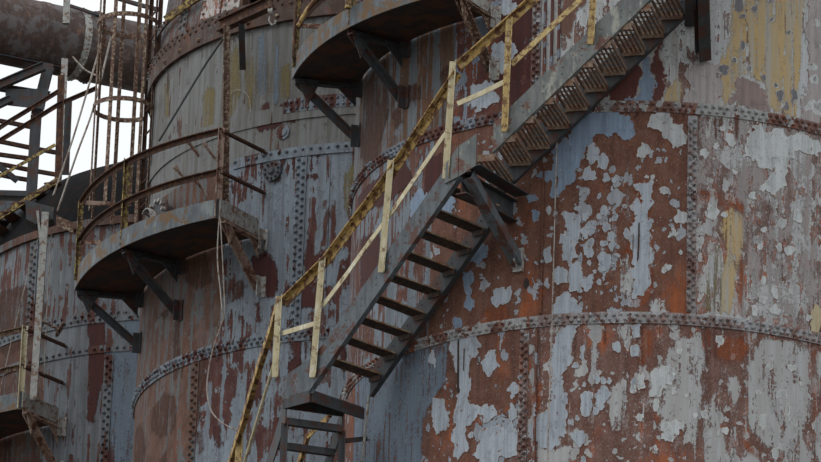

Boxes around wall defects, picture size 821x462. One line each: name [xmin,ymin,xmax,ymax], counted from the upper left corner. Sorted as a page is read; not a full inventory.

peeling [647,112,688,148]
corrosion [371,161,412,210]
corrosion [423,152,443,195]
peeling [526,112,636,222]
corrosion [250,252,290,324]
corrosion [301,281,328,309]
corrosion [360,232,380,288]
peeling [543,174,671,314]
peeling [697,115,821,333]
corrosion [287,340,312,374]
peeling [353,336,519,462]
peeling [528,323,821,462]